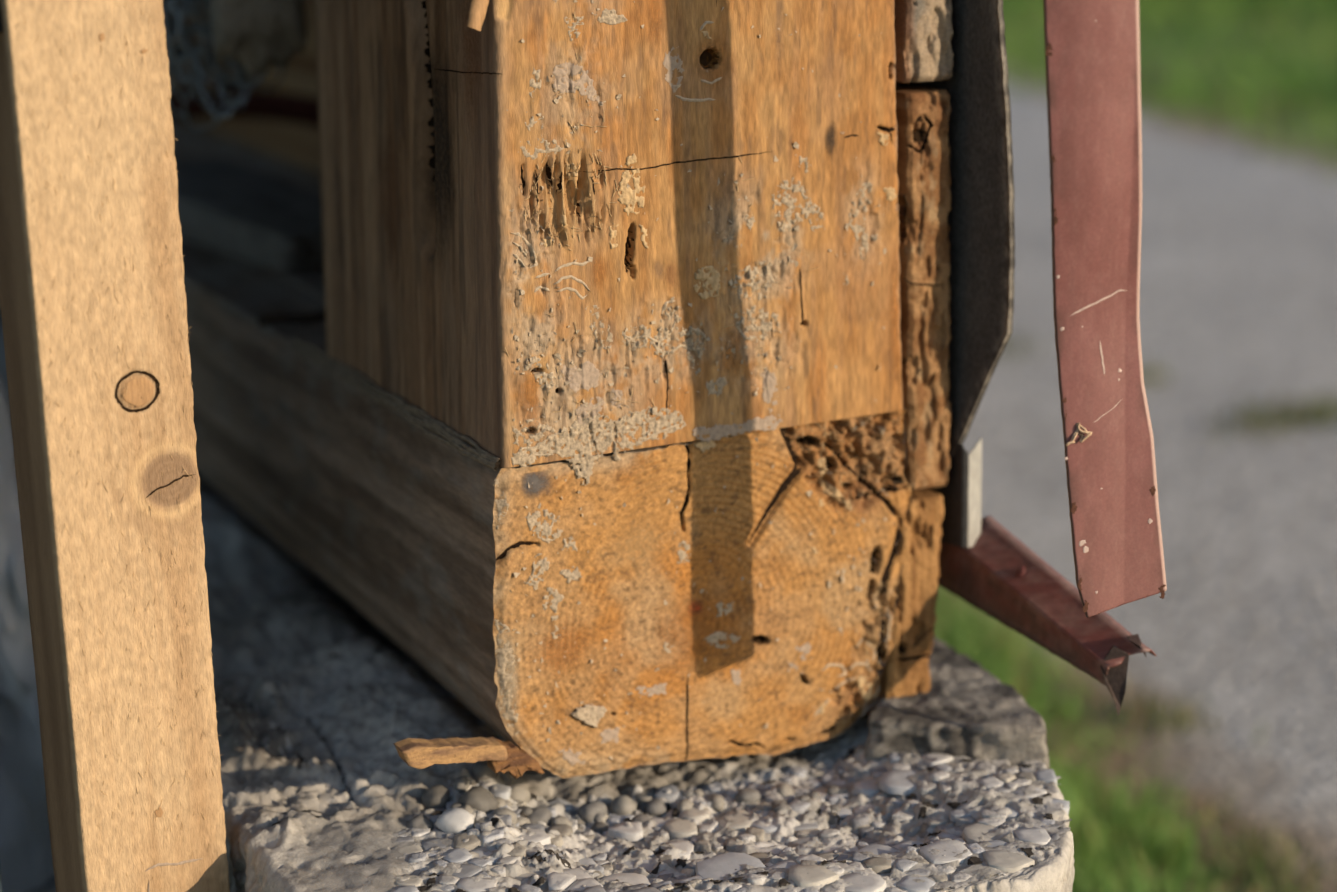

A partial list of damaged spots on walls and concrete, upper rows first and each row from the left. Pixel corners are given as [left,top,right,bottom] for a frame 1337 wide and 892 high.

crack [521,151,773,203]
water stain [827,128,835,152]
crack [680,442,691,529]
crack [748,427,936,671]
crack [683,677,691,760]